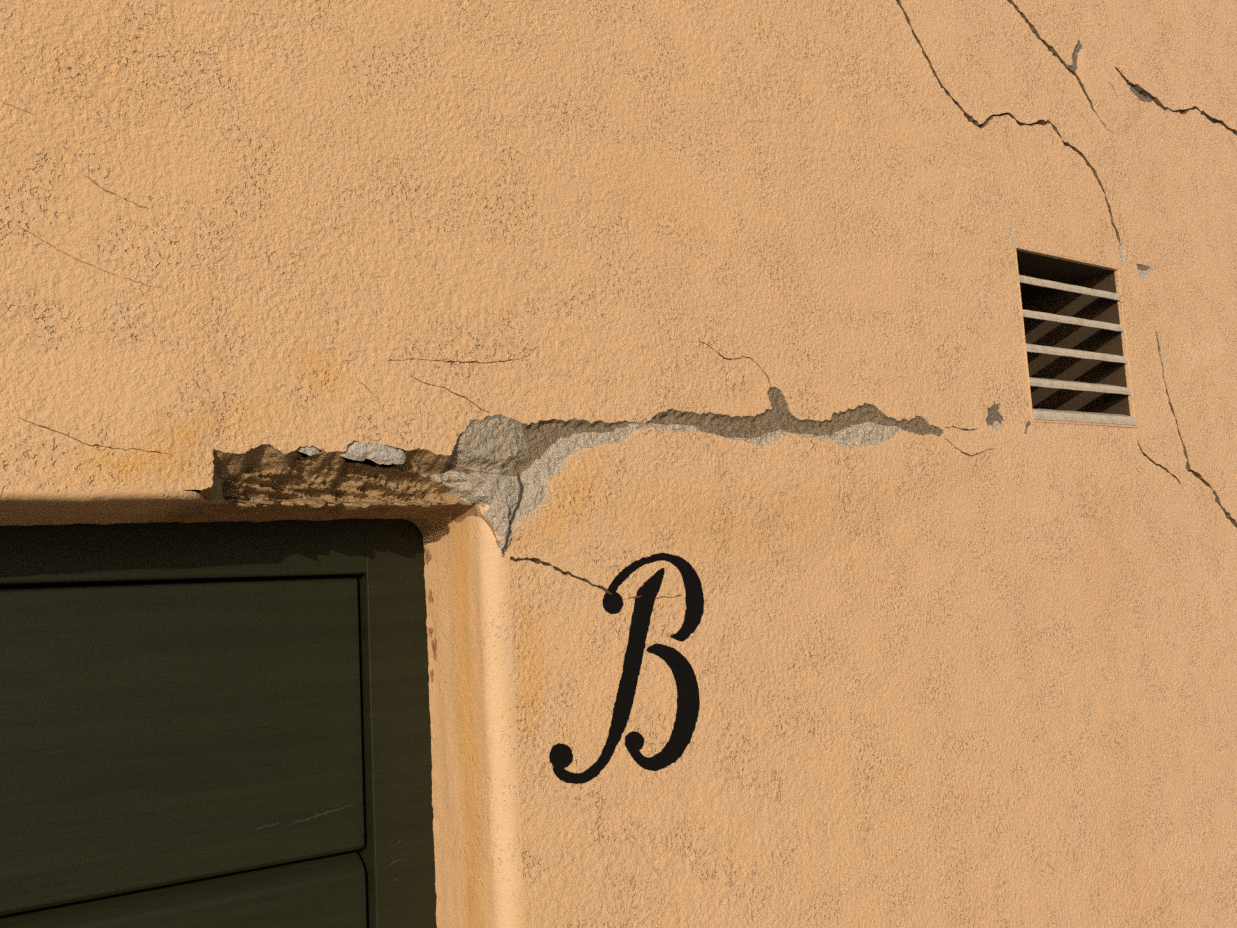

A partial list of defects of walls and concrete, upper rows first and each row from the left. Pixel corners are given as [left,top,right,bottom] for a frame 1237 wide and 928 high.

crack [896,0,1120,244]
crack [1007,0,1237,151]
spalling [199,387,944,551]
crack [501,473,682,599]
crack [1137,332,1237,528]